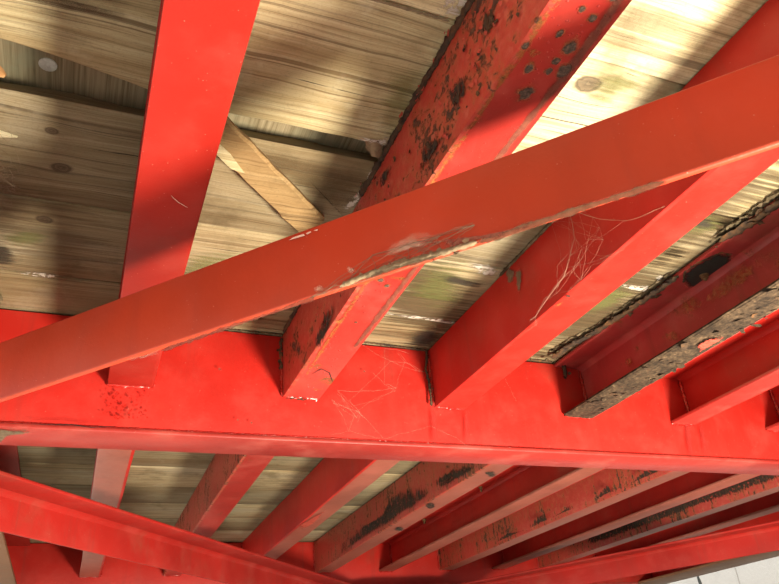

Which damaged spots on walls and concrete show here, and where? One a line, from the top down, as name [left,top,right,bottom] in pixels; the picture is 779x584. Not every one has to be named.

rust [355,0,475,197]
rust [495,0,623,160]
peeling [310,307,333,348]
rust [341,488,435,552]
rust [436,466,472,487]
rust [588,475,778,543]